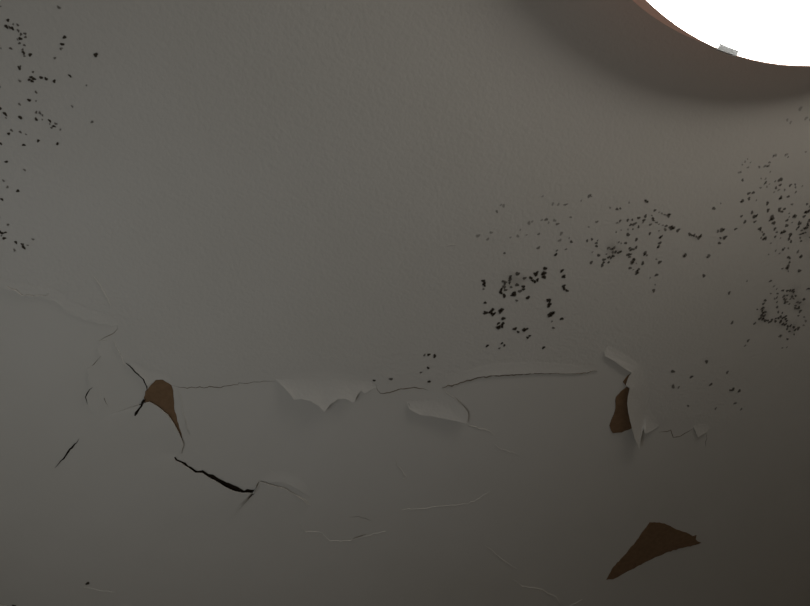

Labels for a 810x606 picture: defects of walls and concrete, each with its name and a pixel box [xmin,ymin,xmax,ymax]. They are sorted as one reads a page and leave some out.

mould [0,19,32,70]
mould [586,200,702,275]
mould [717,178,810,272]
mould [499,267,547,302]
mould [483,301,531,339]
mould [753,280,809,348]
spalling [126,360,190,438]
peeling [275,372,376,412]
peeling [604,346,661,449]
crack [174,457,259,493]
spalling [606,522,701,580]